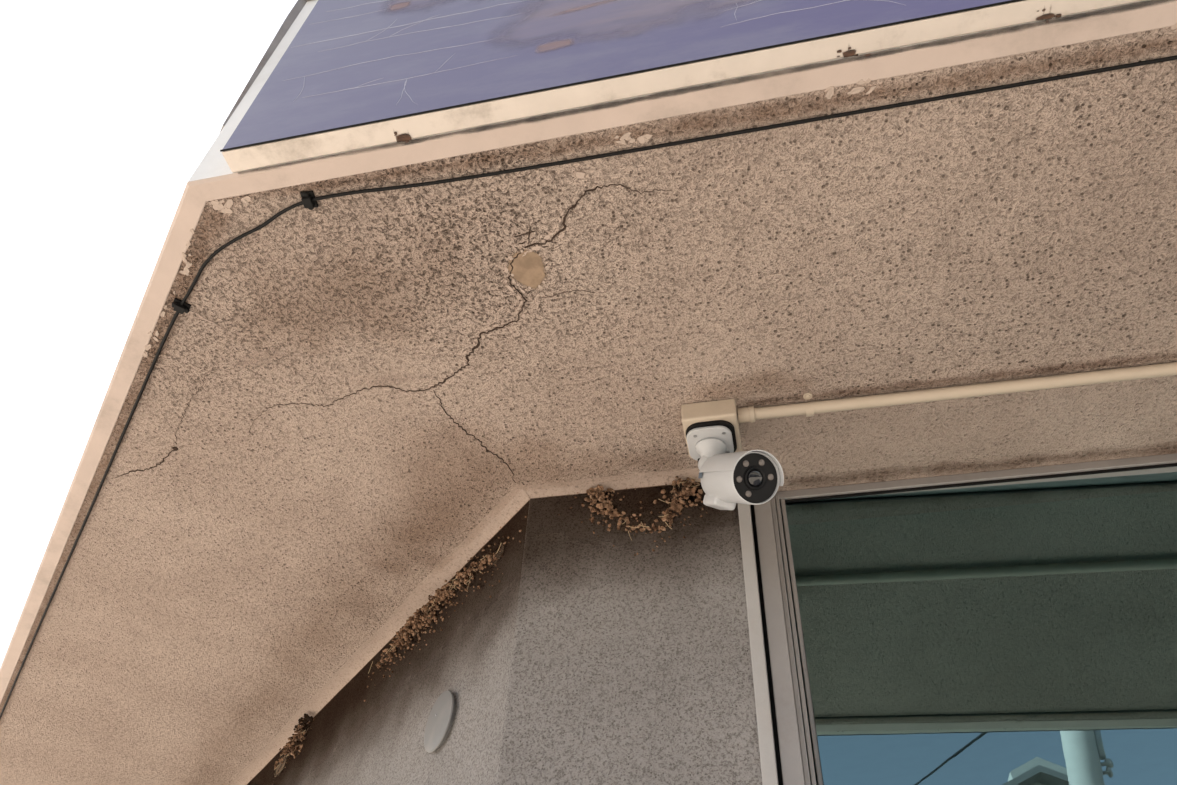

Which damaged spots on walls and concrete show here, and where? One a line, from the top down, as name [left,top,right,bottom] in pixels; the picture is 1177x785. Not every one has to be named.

crack [114,375,208,479]
crack [248,184,671,482]